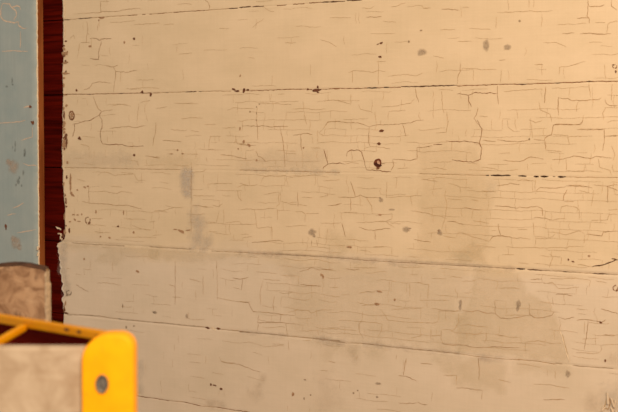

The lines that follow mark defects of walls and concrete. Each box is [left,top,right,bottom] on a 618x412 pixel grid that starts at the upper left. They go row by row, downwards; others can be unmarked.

crack [72,2,160,158]
crack [545,0,615,46]
crack [191,65,618,296]
peeling [56,195,70,314]
crack [217,267,331,348]
crack [305,276,616,365]